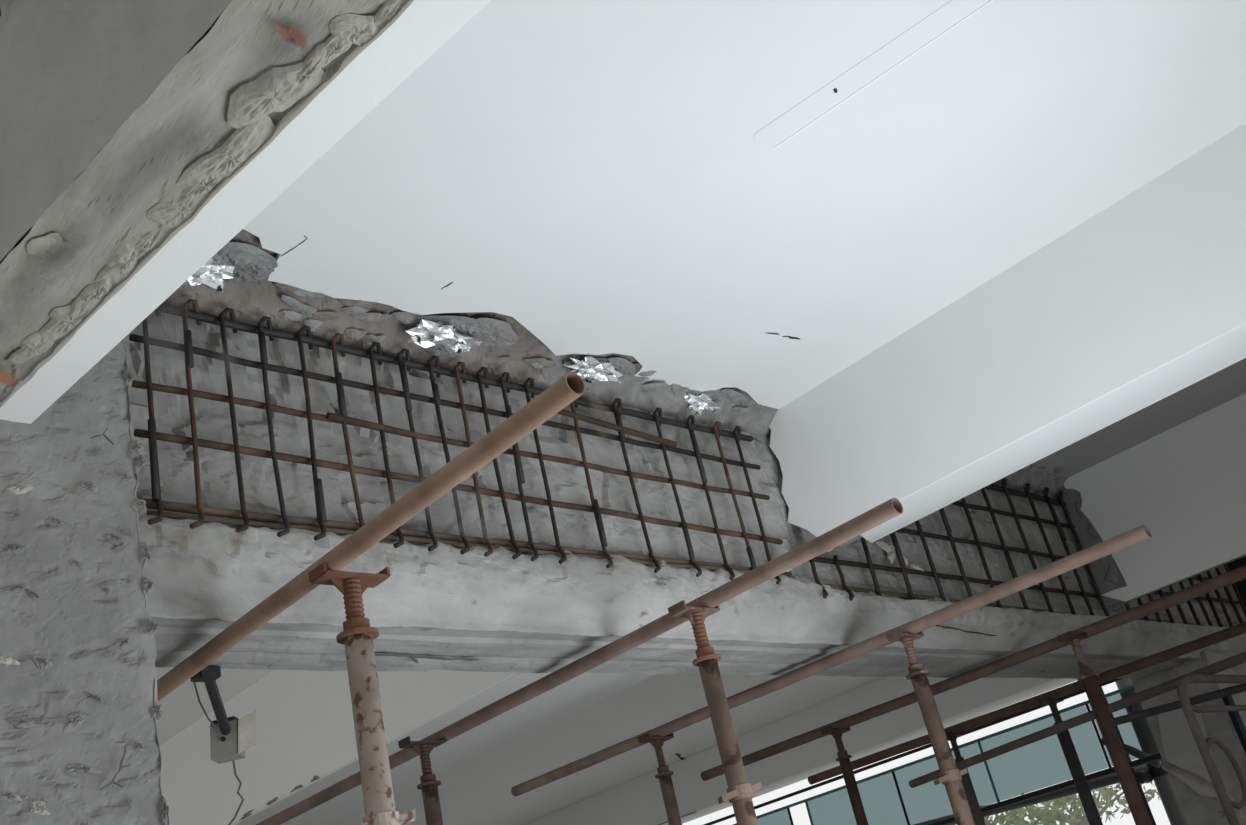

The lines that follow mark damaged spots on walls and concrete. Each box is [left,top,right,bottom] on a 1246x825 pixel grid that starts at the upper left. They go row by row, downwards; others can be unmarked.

spalling [115,229,783,580]
spalling [103,534,154,596]
spalling [776,463,1246,627]
spalling [0,654,52,671]
spalling [63,692,107,733]
spalling [158,796,169,825]